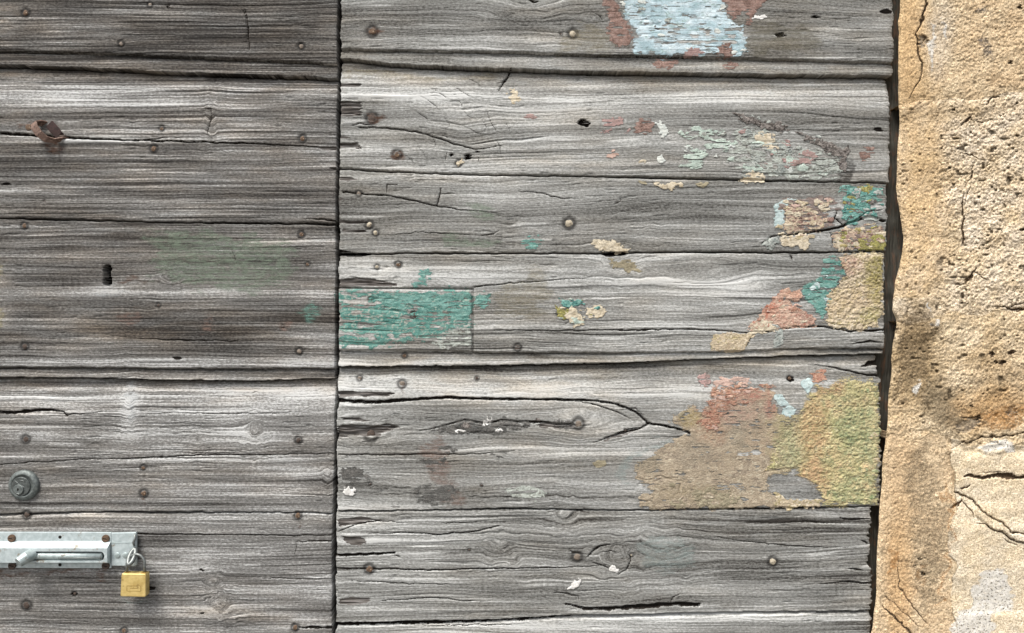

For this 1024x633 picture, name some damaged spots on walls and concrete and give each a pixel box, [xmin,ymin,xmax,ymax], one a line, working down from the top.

peeling [602,0,767,70]
crack [910,0,928,96]
peeling [591,239,643,273]
peeling [600,112,886,353]
peeling [334,268,492,352]
peeling [555,298,607,328]
crack [0,396,690,465]
peeling [634,369,881,513]
crack [952,471,1024,545]
crack [137,520,700,629]